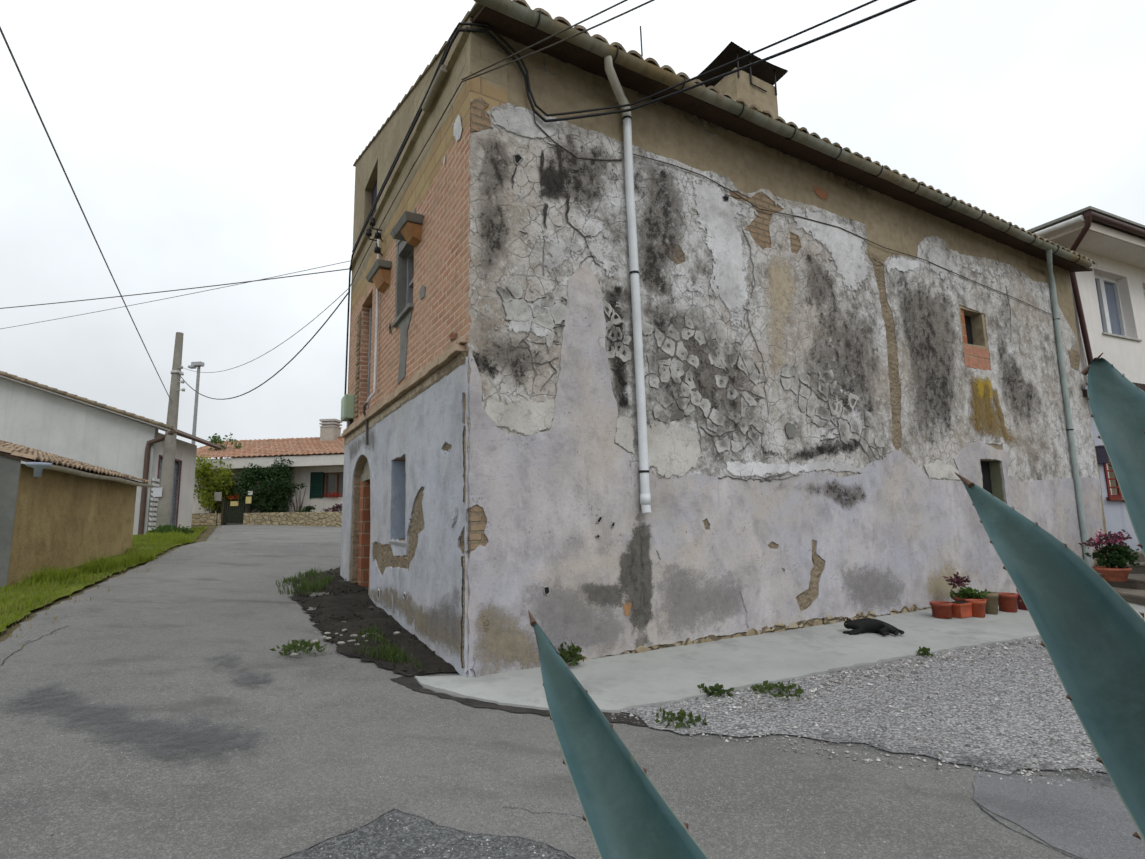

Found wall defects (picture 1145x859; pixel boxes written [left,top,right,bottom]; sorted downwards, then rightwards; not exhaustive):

damp [539,136,618,242]
crack [497,221,602,391]
damp [604,286,629,409]
crack [645,229,800,482]
damp [634,155,880,460]
peeling [495,170,1023,480]
crack [809,387,891,464]
crack [0,626,69,666]
spalling [371,486,425,575]
spalling [458,504,488,555]
damp [476,515,742,676]
spalling [796,540,825,612]